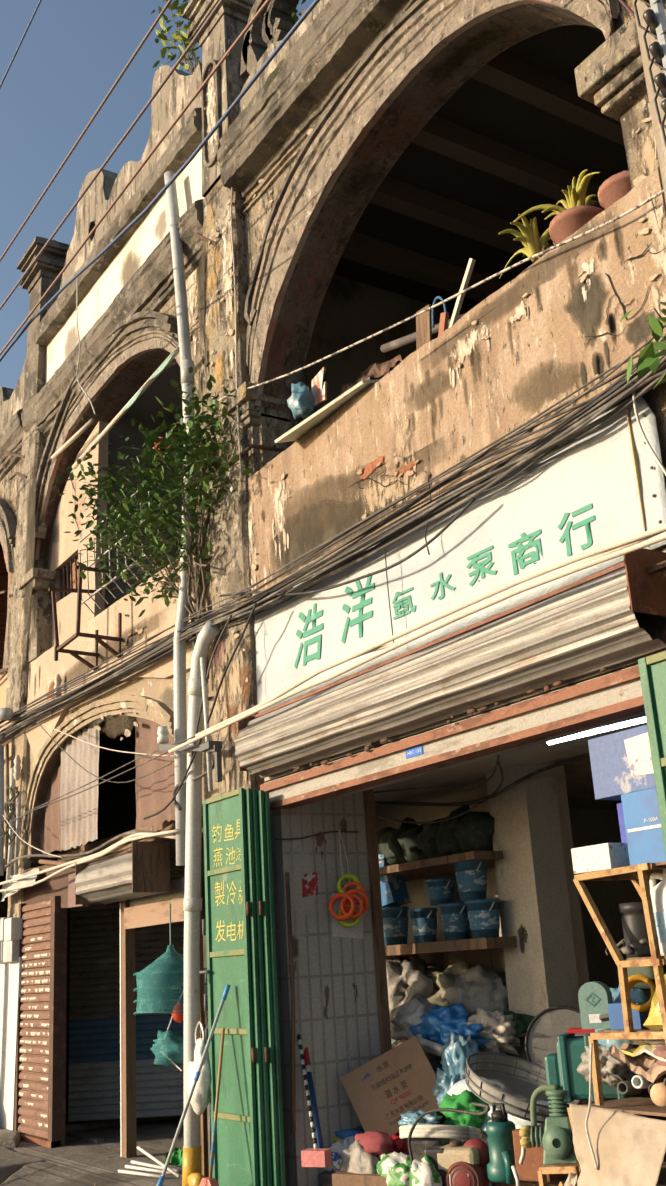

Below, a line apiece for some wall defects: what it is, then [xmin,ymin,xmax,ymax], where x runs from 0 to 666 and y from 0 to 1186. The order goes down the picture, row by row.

flaking render [185,200,235,356]
flaking render [209,350,233,418]
water stain [272,227,654,600]
peeling [449,320,490,387]
peeling [272,472,291,560]
peeling [356,418,420,520]